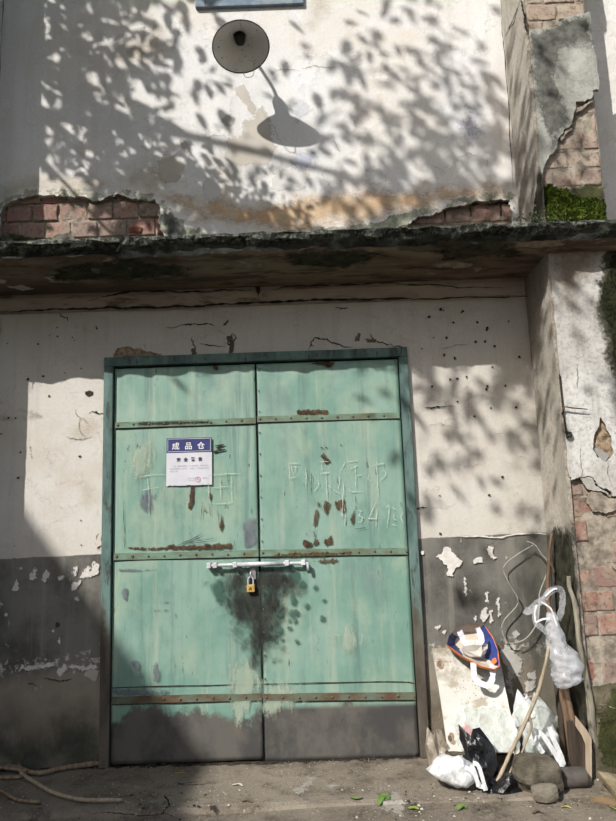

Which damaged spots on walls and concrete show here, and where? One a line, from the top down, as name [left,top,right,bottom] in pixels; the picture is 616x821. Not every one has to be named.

peeling [221,85,310,191]
flaking render [543,97,602,194]
flaking render [0,196,164,242]
damp [47,187,203,236]
damp [321,207,438,230]
flaking render [593,420,612,462]
peeling [17,561,99,601]
corrosion [129,543,232,551]
corrosion [274,499,356,564]
peeling [436,547,463,576]
damp [278,581,318,641]
peeling [474,592,501,624]